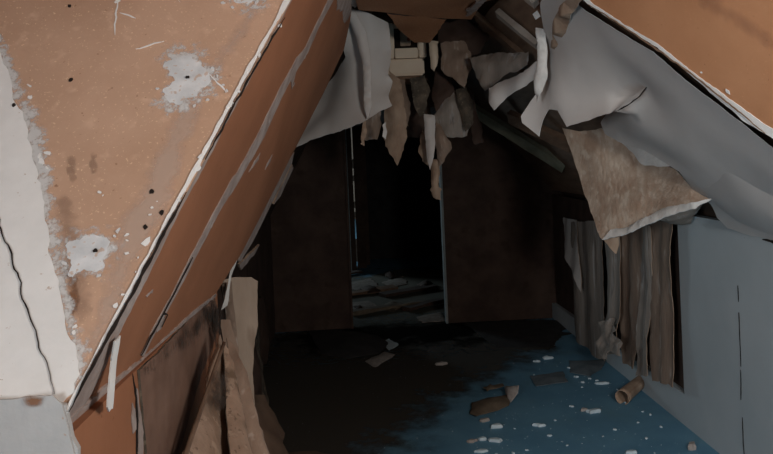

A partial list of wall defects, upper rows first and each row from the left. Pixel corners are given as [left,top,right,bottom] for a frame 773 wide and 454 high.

crack [0,227,55,394]